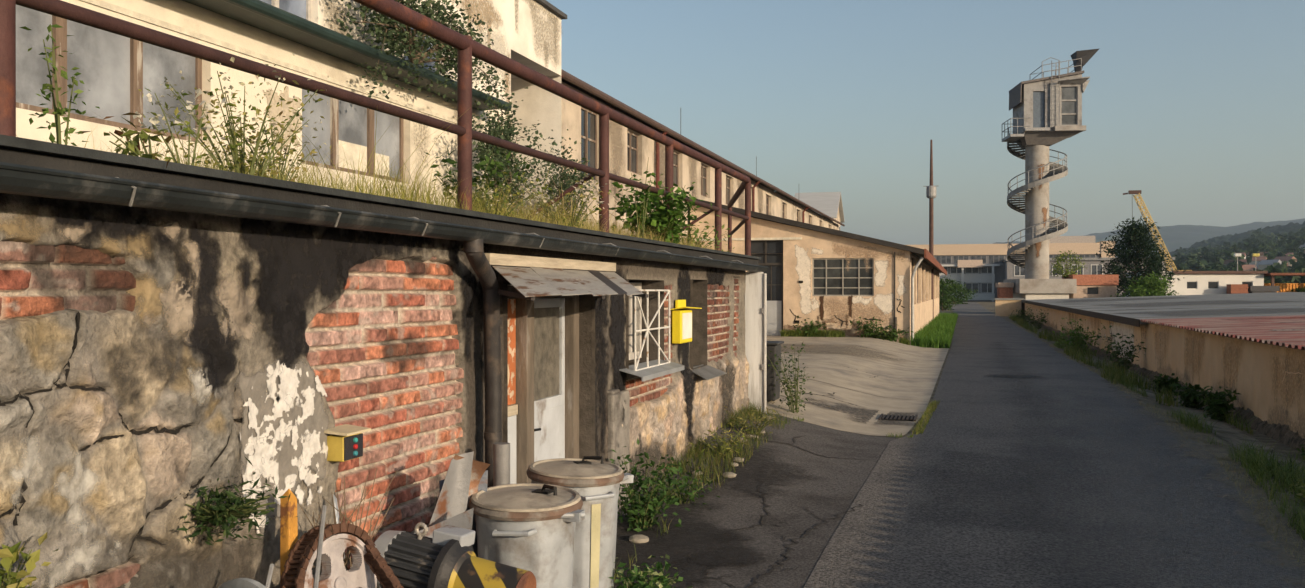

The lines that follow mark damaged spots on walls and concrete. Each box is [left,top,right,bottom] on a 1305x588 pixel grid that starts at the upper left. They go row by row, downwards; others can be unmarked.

water stain [239,257,305,369]
water stain [340,250,357,287]
peeling [783,245,908,340]
crack [0,309,192,452]
spalling [236,256,476,542]
crack [0,481,28,526]
crack [95,385,243,575]